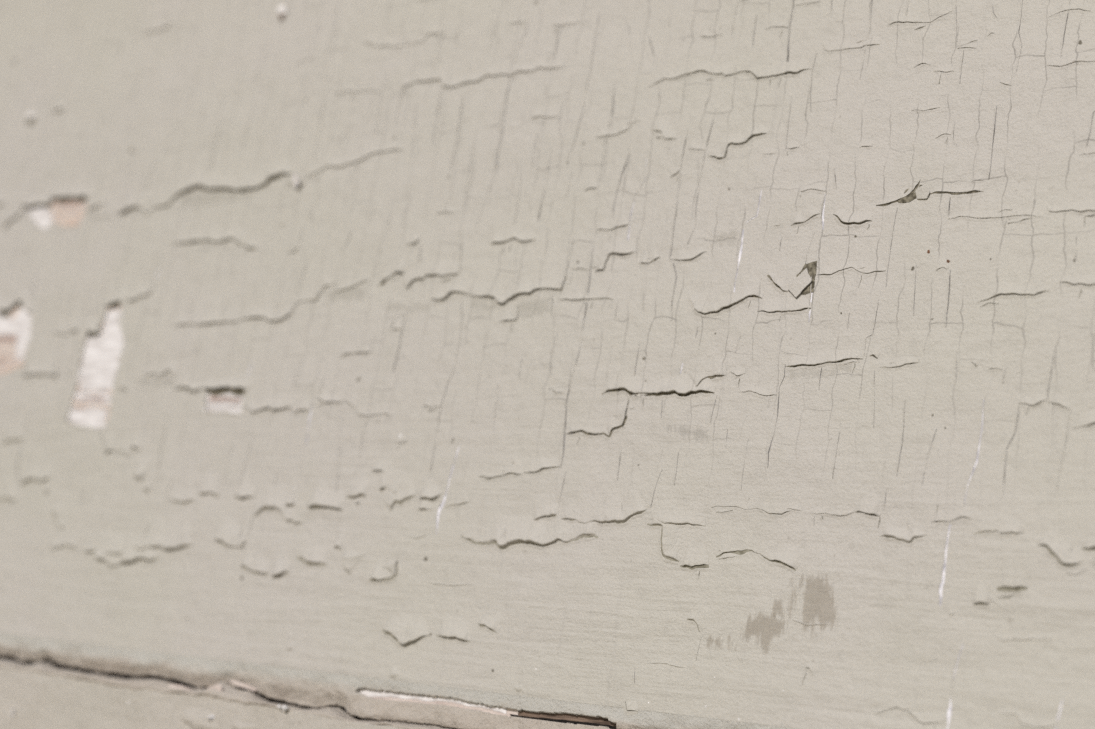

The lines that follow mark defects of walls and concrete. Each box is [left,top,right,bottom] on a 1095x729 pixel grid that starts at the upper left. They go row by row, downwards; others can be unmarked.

crack [3,205,24,231]
peeling [21,183,95,232]
peeling [0,288,38,378]
crack [20,358,60,384]
peeling [64,288,129,433]
peeling [204,376,252,418]
crack [92,0,1095,609]
crack [1,418,51,487]
crack [381,608,501,649]
crack [0,655,380,722]
crack [873,644,963,729]